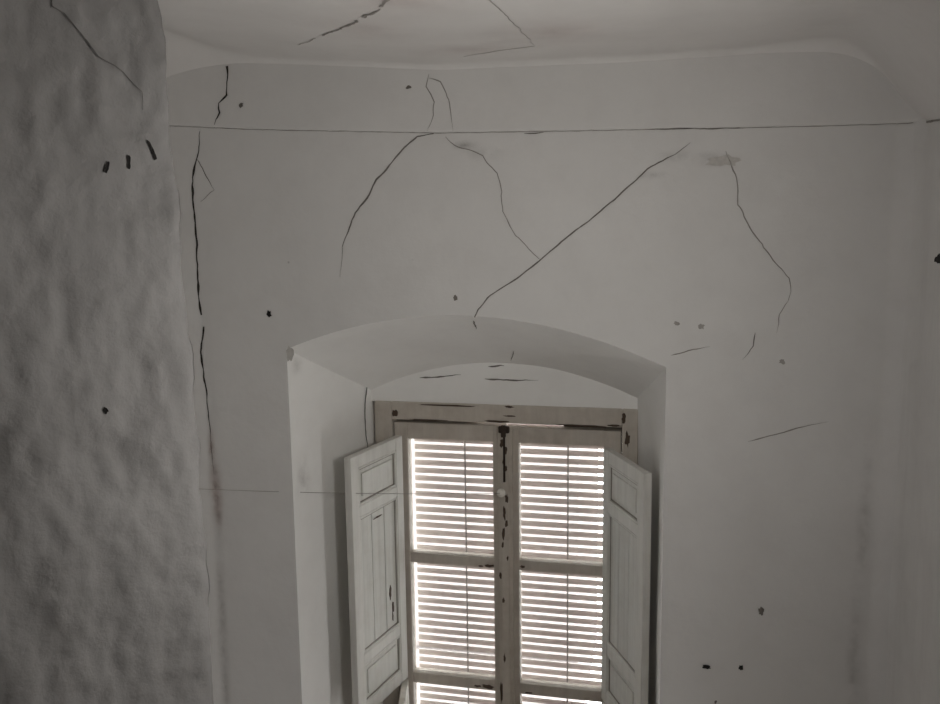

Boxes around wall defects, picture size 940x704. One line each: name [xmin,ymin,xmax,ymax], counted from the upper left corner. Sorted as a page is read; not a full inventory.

crack [299,0,390,45]
crack [464,0,534,57]
crack [175,66,940,470]